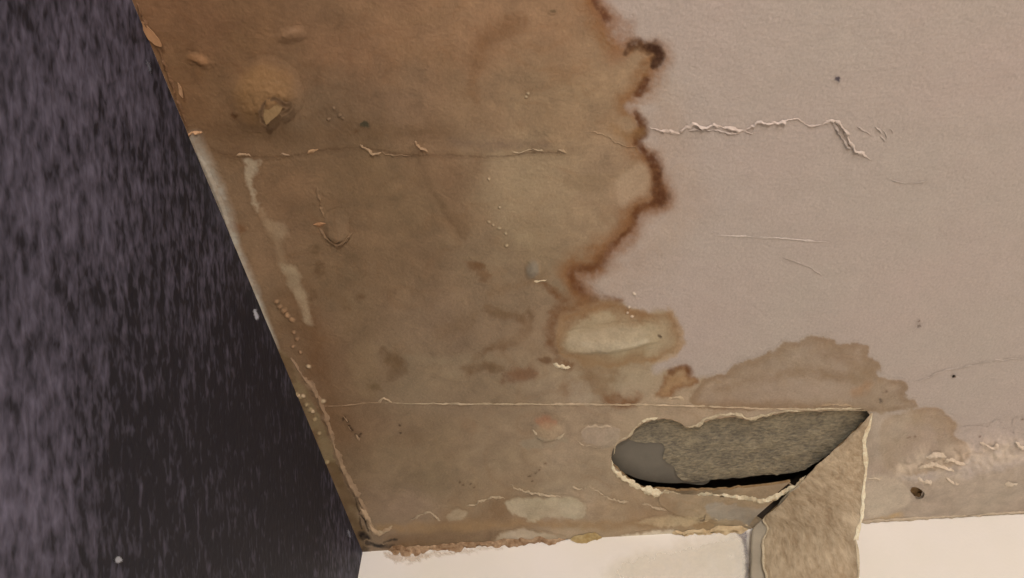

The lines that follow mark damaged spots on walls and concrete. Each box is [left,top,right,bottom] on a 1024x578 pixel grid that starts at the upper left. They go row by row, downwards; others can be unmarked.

crack [188,131,566,160]
crack [593,118,893,160]
damp [132,0,963,551]
peeling [290,357,392,537]
hole [625,454,830,519]
spalling [861,417,1024,524]
peeling [620,513,748,537]